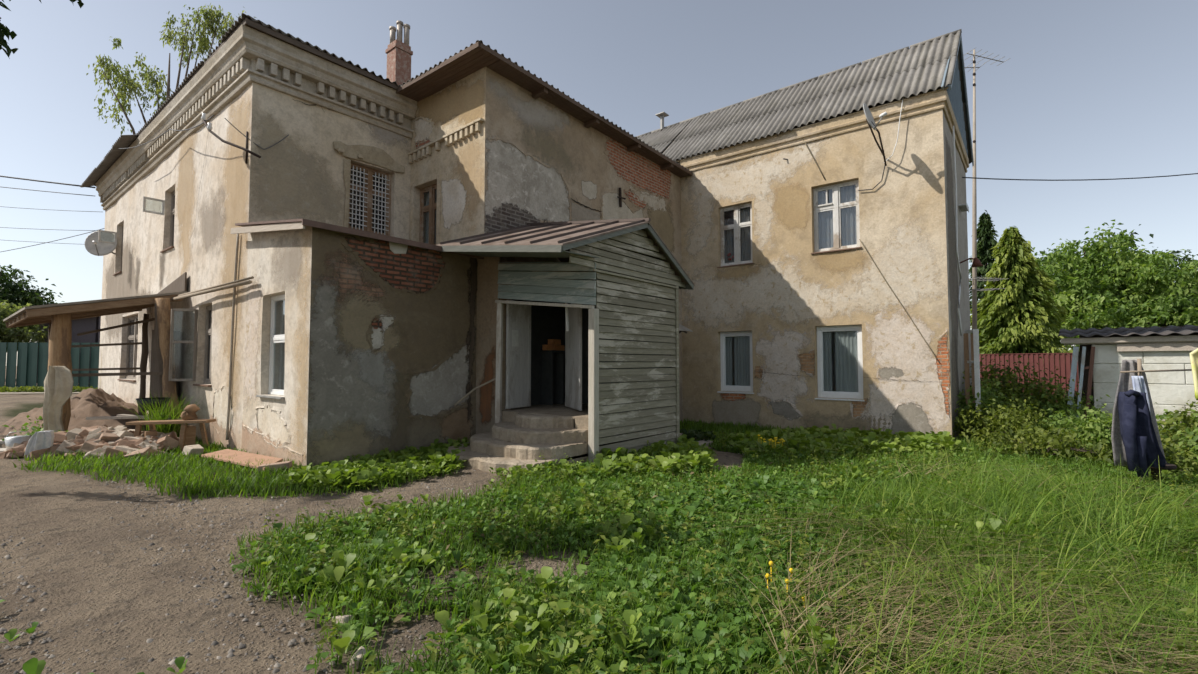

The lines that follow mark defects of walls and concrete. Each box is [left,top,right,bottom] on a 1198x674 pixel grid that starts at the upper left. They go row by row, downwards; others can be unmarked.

peeling [484,135,572,233]
flaking render [600,137,672,220]
peeling [207,233,474,465]
flaking render [796,349,815,378]
flaking render [935,331,951,420]